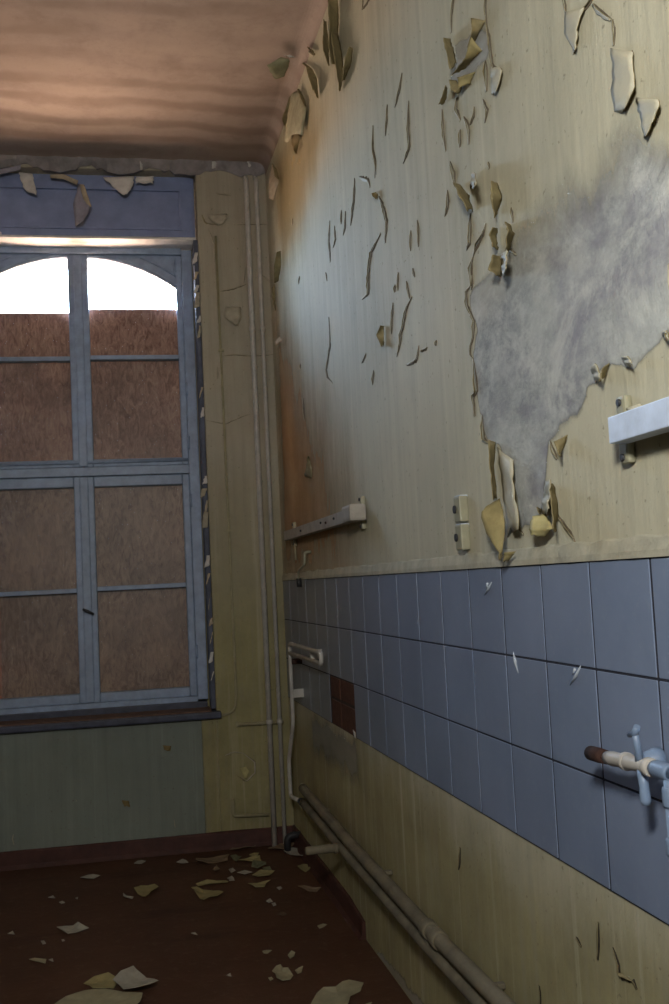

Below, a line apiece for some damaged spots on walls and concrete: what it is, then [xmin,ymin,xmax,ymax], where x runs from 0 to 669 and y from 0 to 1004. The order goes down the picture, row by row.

peeling [308,0,353,91]
peeling [267,55,319,154]
peeling [0,164,37,195]
peeling [103,161,154,195]
peeling [438,0,669,562]